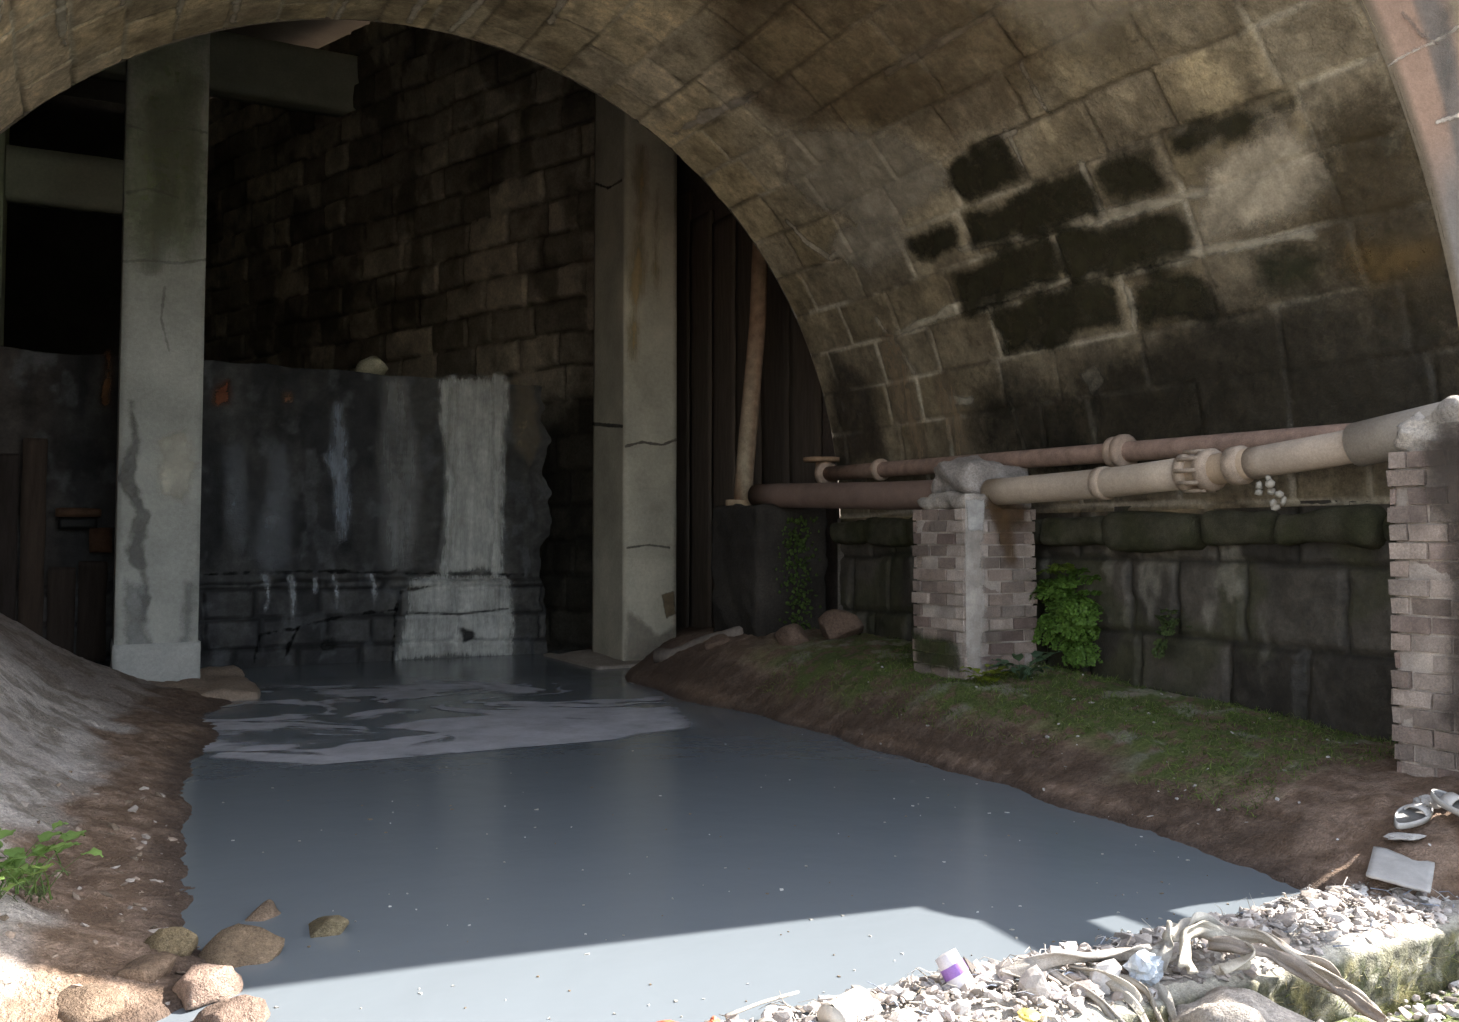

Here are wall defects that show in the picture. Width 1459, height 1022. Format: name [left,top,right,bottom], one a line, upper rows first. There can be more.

leakage [936,91,1459,456]
leakage [326,404,352,537]
leakage [380,374,514,661]
leakage [830,358,882,465]
leakage [875,301,963,459]
leakage [965,496,984,668]
leakage [1052,463,1107,471]
leakage [1424,421,1459,727]